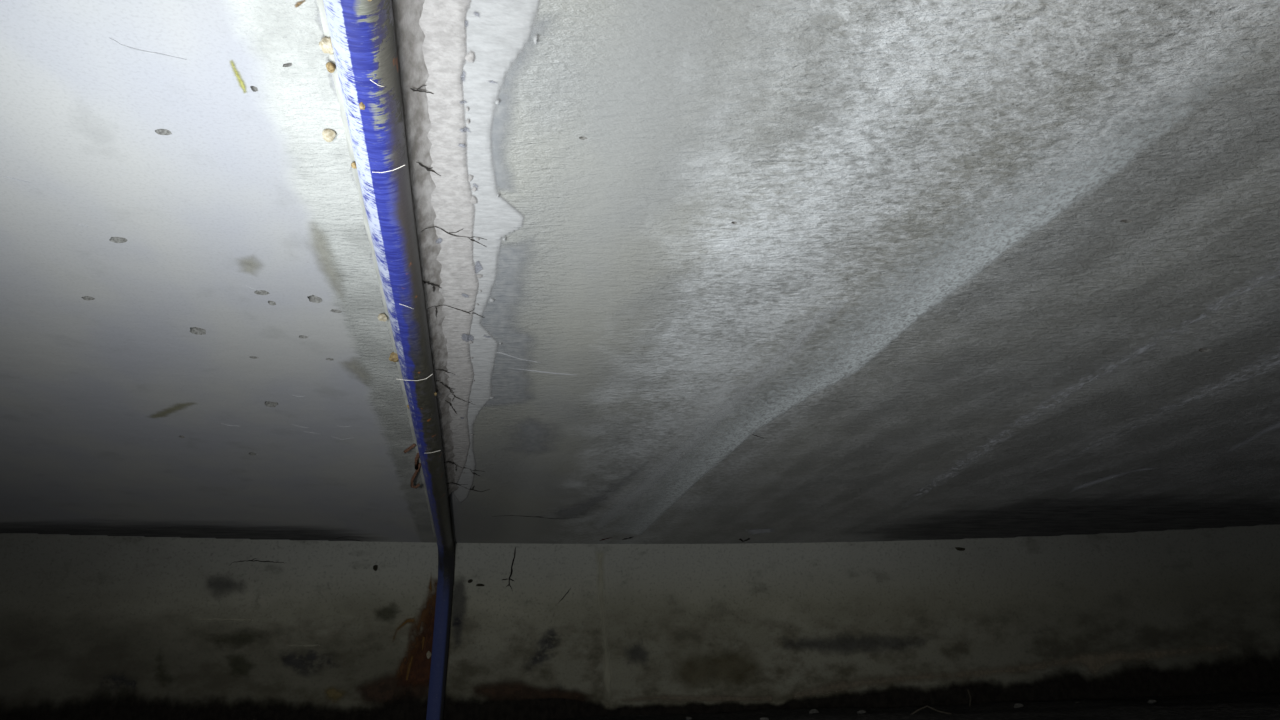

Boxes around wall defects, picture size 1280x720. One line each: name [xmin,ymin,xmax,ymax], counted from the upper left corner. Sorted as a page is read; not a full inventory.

peeling [392,0,539,502]
rust [398,581,438,685]